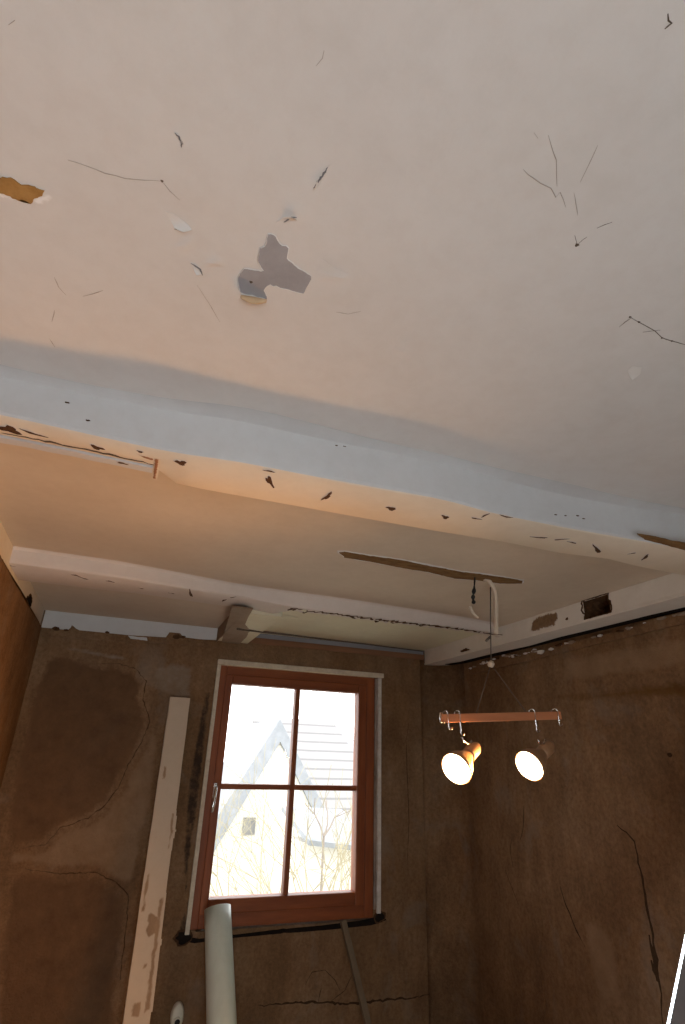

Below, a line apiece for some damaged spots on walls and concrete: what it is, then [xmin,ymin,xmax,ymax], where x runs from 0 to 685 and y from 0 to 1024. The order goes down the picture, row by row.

peeling [0,177,59,210]
crack [69,160,176,197]
crack [523,133,612,247]
peeling [237,217,312,304]
crack [623,316,685,345]
flaking render [0,424,49,438]
flaking render [637,533,685,550]
flaking render [337,550,524,584]
flaking render [468,610,685,675]
leakage [175,689,214,945]
crack [617,825,663,1024]
crack [259,970,429,1007]